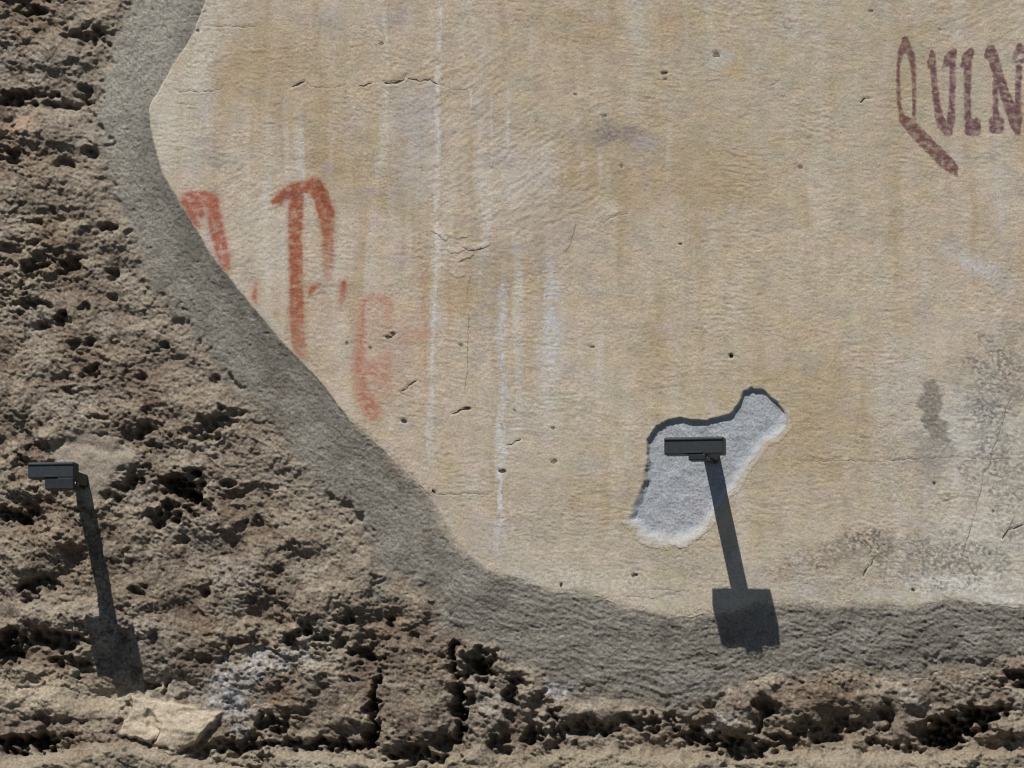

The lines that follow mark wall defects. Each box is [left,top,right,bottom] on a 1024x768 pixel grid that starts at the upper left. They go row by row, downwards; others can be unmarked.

crack [292,77,468,90]
flaking render [431,224,490,278]
spalling [621,382,792,550]
damp [737,321,1024,609]
crack [801,388,1023,576]